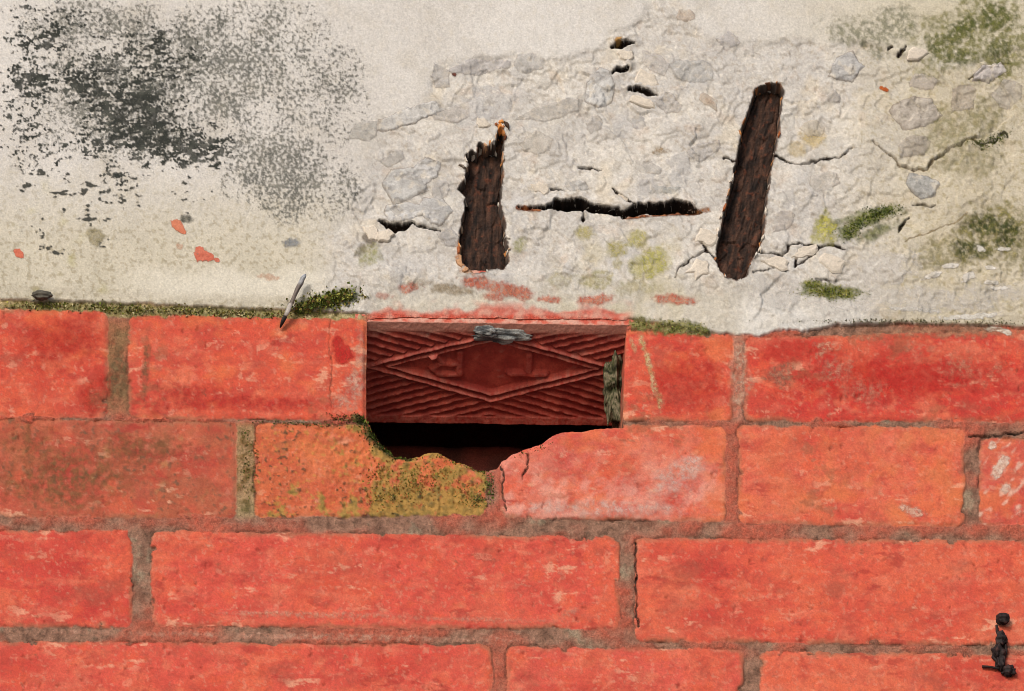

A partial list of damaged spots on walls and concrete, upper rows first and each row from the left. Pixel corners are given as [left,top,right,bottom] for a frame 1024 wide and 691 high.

leakage [0,0,367,247]
crack [889,131,1008,172]
spalling [327,0,1024,368]
crack [378,220,441,234]
crack [676,245,718,273]
crack [752,243,845,284]
spalling [254,420,728,524]
crack [500,458,529,511]